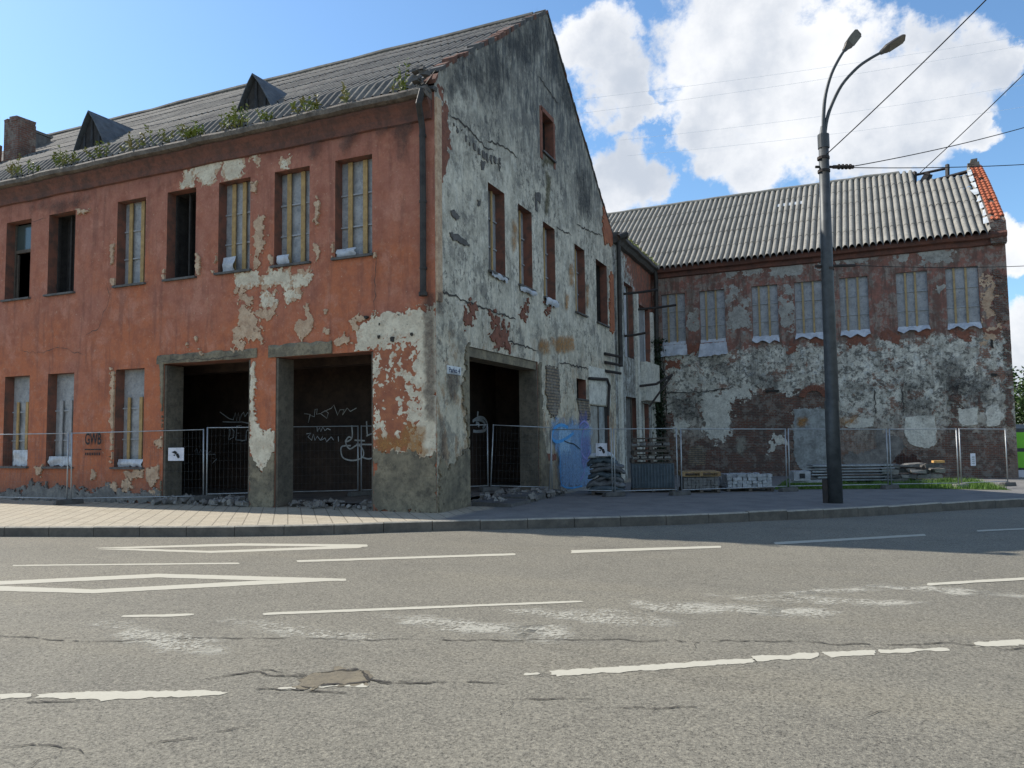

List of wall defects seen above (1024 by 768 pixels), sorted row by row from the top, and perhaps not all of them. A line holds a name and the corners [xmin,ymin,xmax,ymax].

flaking render [179,154,261,194]
flaking render [278,153,293,169]
crack [450,115,517,158]
peeling [195,253,218,276]
flaking render [230,210,530,513]
flaking render [663,306,700,370]
flaking render [719,263,823,355]
flaking render [842,267,1016,479]
flaking render [672,382,825,476]